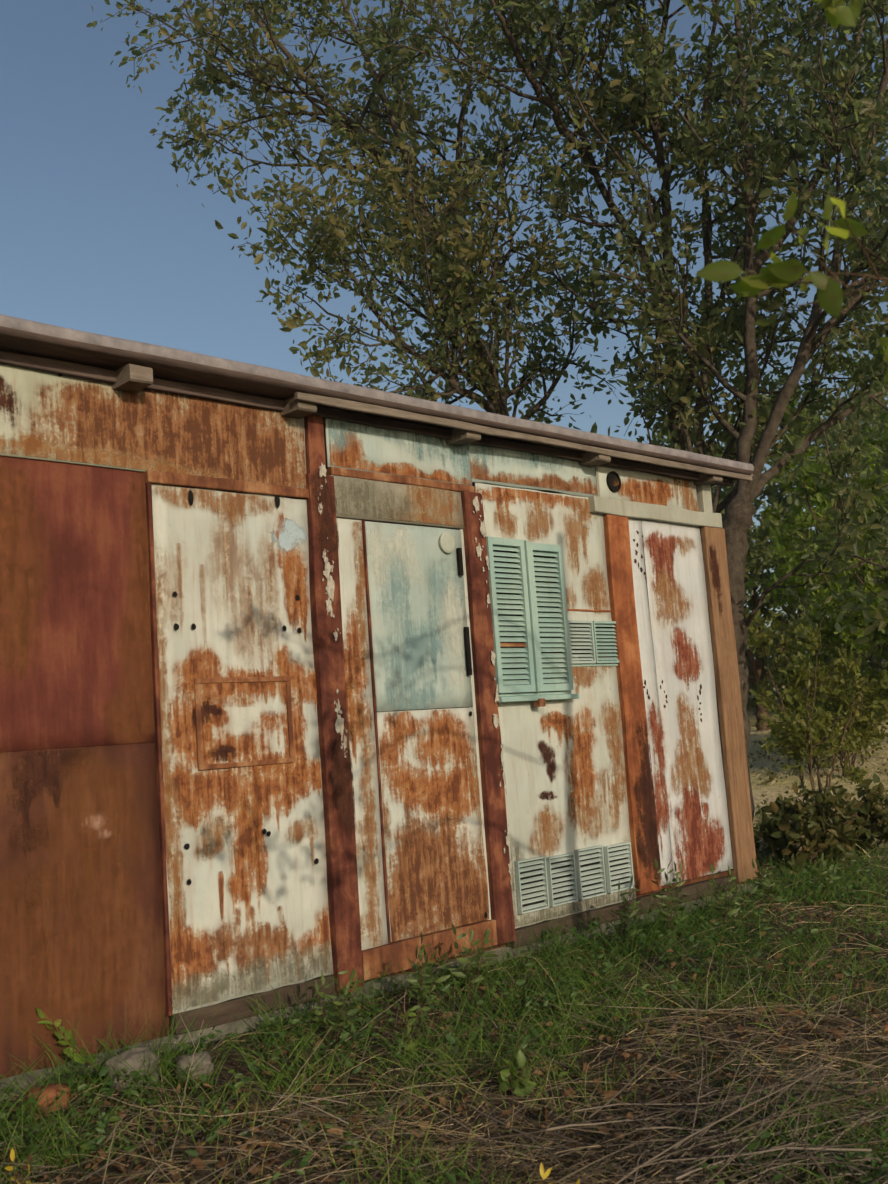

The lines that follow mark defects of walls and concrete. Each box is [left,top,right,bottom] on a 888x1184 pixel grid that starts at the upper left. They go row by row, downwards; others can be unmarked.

rust [617,478,699,512]
rust [0,383,610,1009]
rust [530,532,725,886]